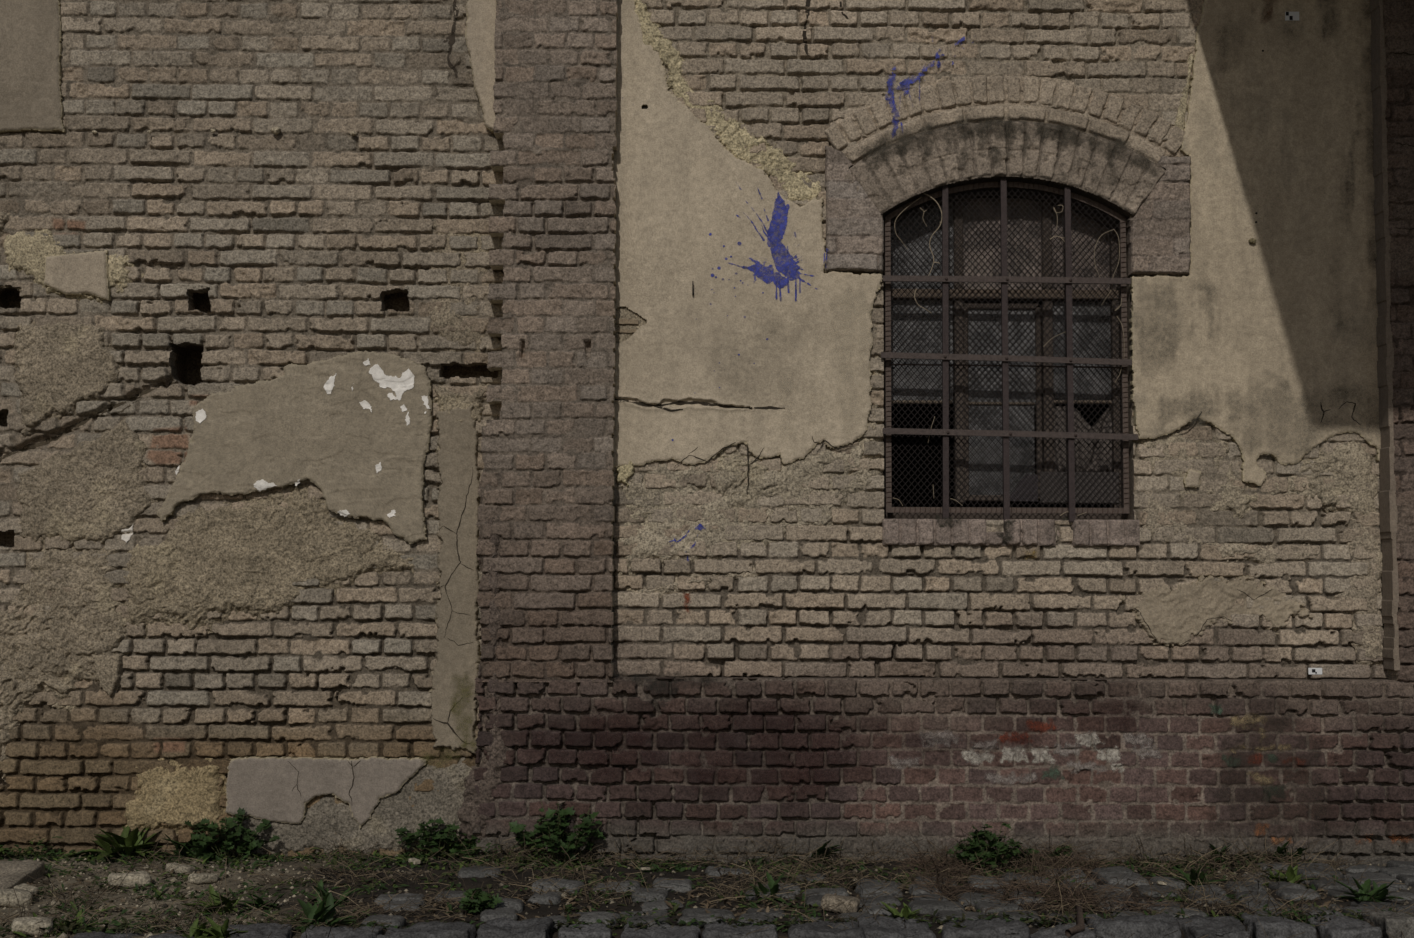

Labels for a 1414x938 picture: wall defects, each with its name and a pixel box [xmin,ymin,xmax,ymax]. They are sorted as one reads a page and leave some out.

spalling [635,0,822,201]
spalling [0,209,144,437]
spalling [192,293,211,315]
peeling [0,340,498,791]
spalling [378,292,410,312]
crack [438,467,473,646]
crack [615,399,785,412]
crack [675,442,764,495]
spalling [124,504,514,856]
crack [433,697,470,744]